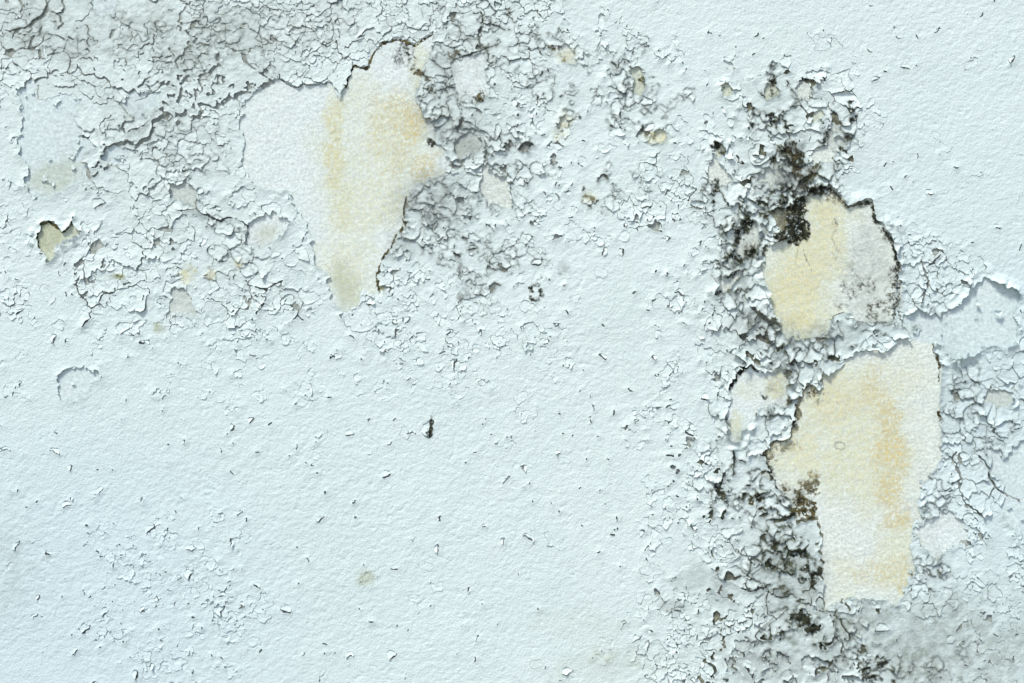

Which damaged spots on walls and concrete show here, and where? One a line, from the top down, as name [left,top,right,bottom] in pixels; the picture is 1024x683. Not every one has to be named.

water stain [345,34,447,93]
water stain [367,106,436,156]
peeling [0,0,695,407]
water stain [342,179,417,291]
peeling [399,419,434,439]
peeling [544,54,1024,683]
water stain [714,142,901,659]
water stain [860,660,899,682]